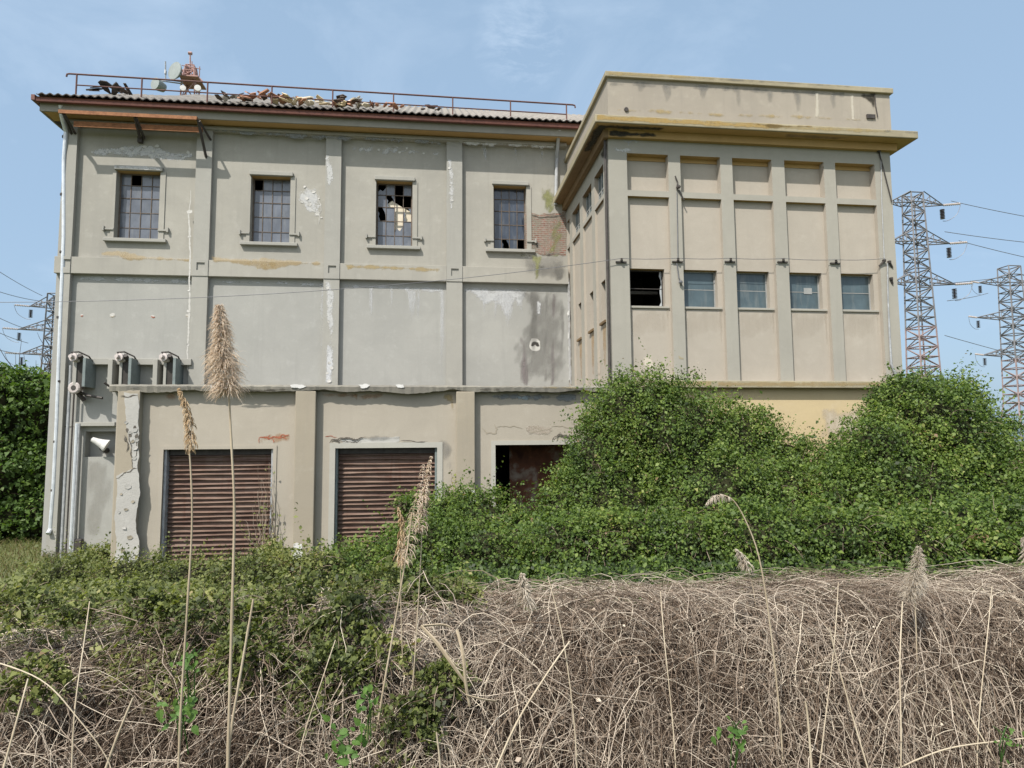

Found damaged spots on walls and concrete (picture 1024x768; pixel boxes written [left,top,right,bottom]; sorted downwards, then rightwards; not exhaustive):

damp [851,93,875,119]
peeling [300,186,323,225]
flaking render [524,211,567,256]
peeling [114,392,140,567]